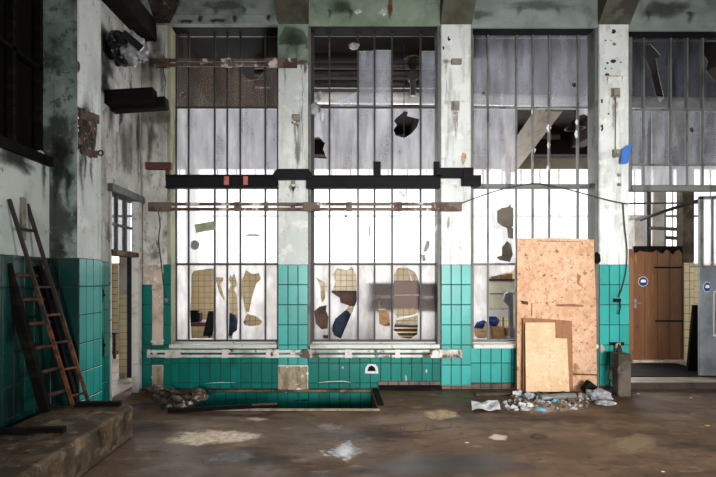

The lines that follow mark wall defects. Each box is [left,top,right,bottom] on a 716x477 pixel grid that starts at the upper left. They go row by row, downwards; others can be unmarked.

damp [122,115,155,170]
damp [43,151,92,195]
peeling [142,263,164,345]
peeling [278,365,309,393]